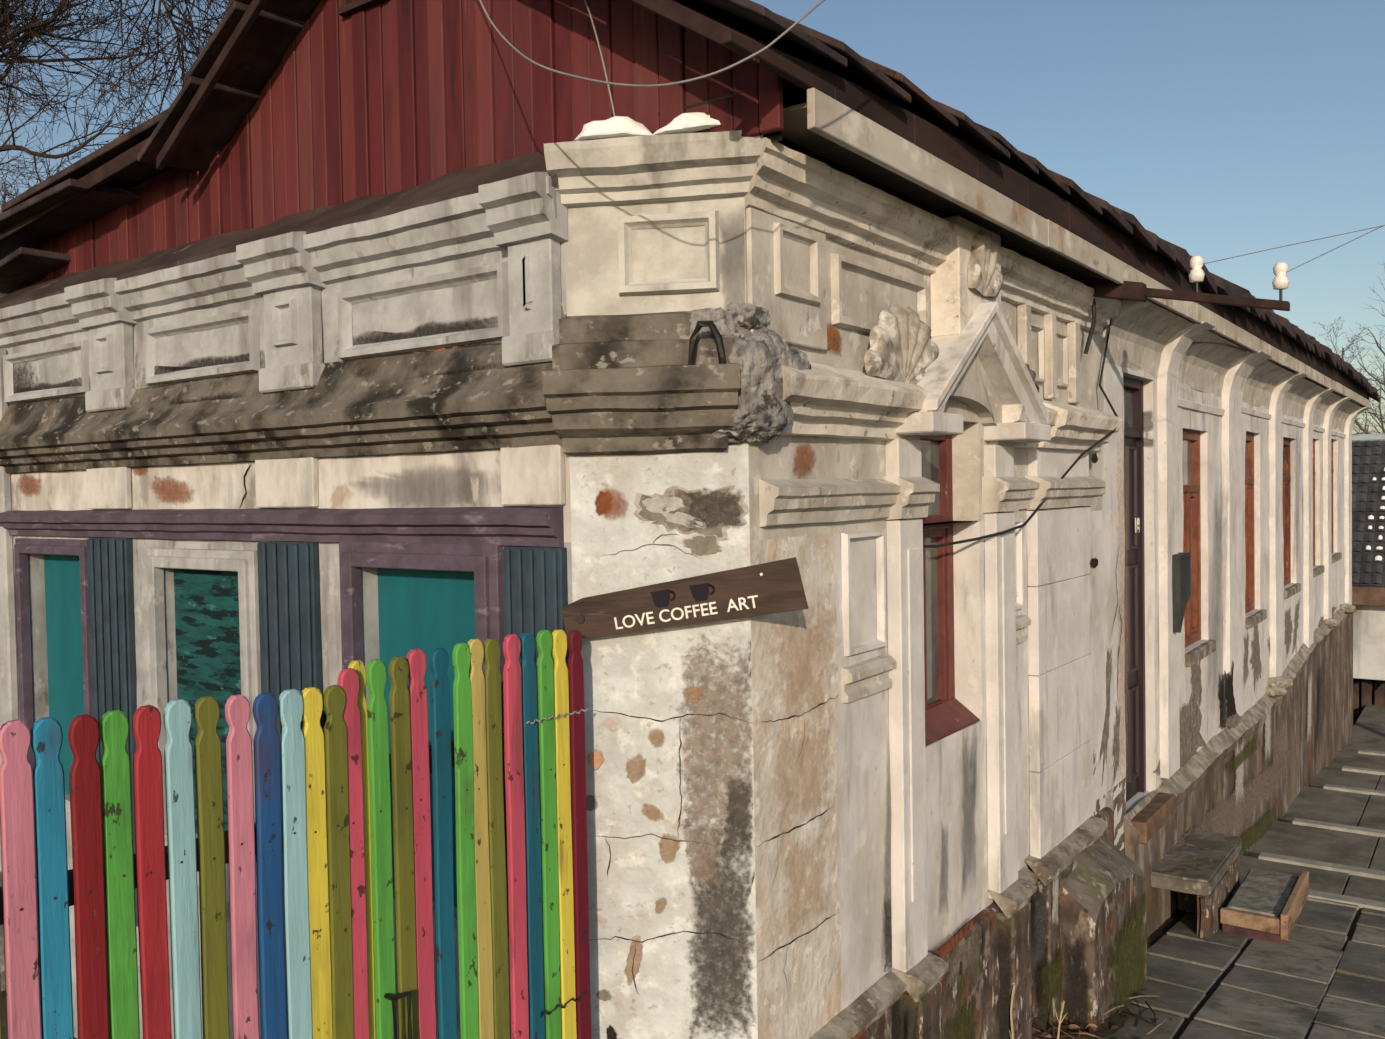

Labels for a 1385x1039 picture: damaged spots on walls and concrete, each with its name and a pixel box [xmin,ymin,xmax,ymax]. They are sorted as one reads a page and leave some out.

crack [240,466,250,506]
peeling [633,485,749,556]
crack [587,694,840,884]
leakage [679,643,755,1038]